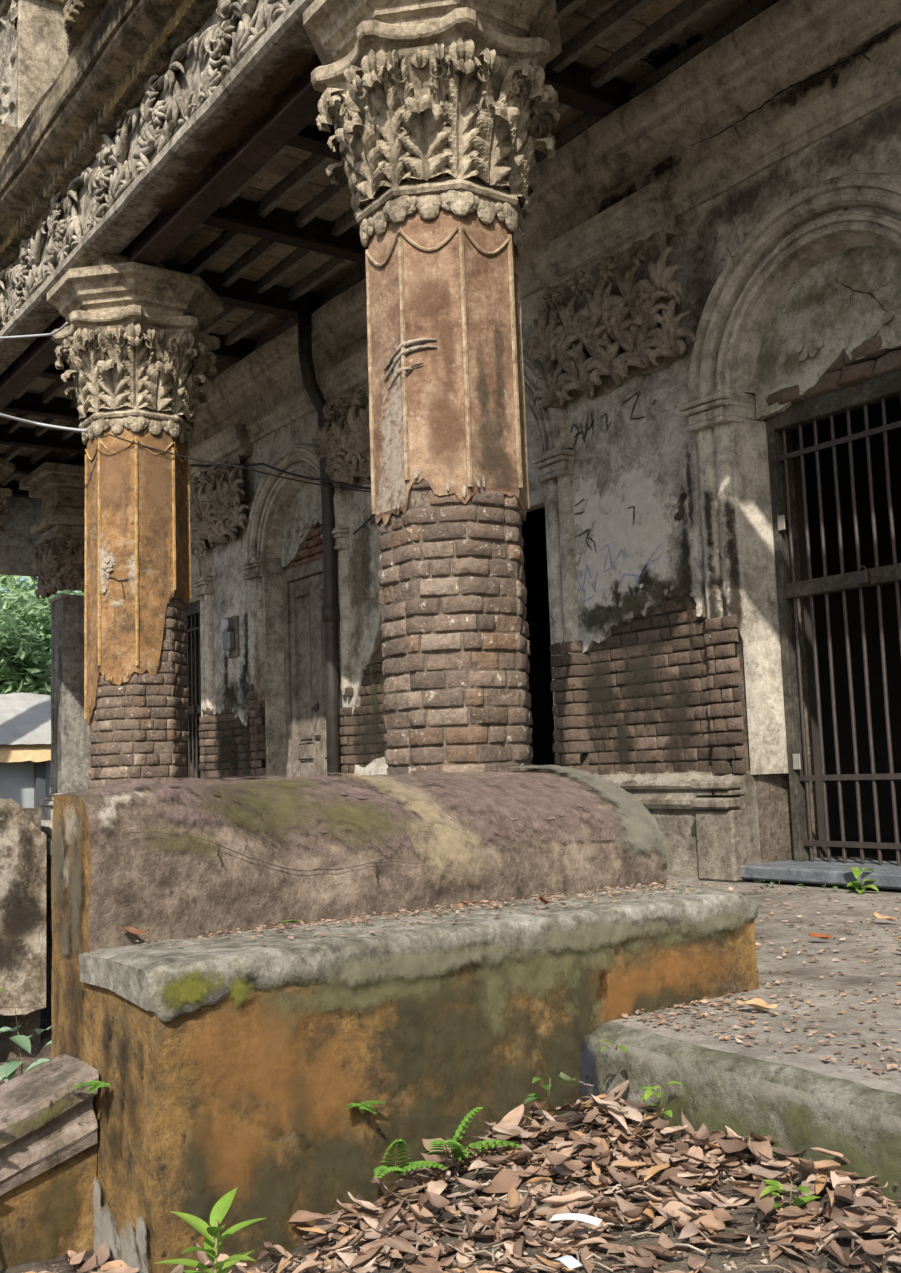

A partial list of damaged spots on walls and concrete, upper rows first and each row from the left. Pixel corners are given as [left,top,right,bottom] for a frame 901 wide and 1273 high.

crack [685,51,871,149]
spalling [766,313,901,406]
spalling [88,345,746,869]
water stain [681,445,742,654]
water stain [0,826,40,971]
peeling [93,1178,148,1273]